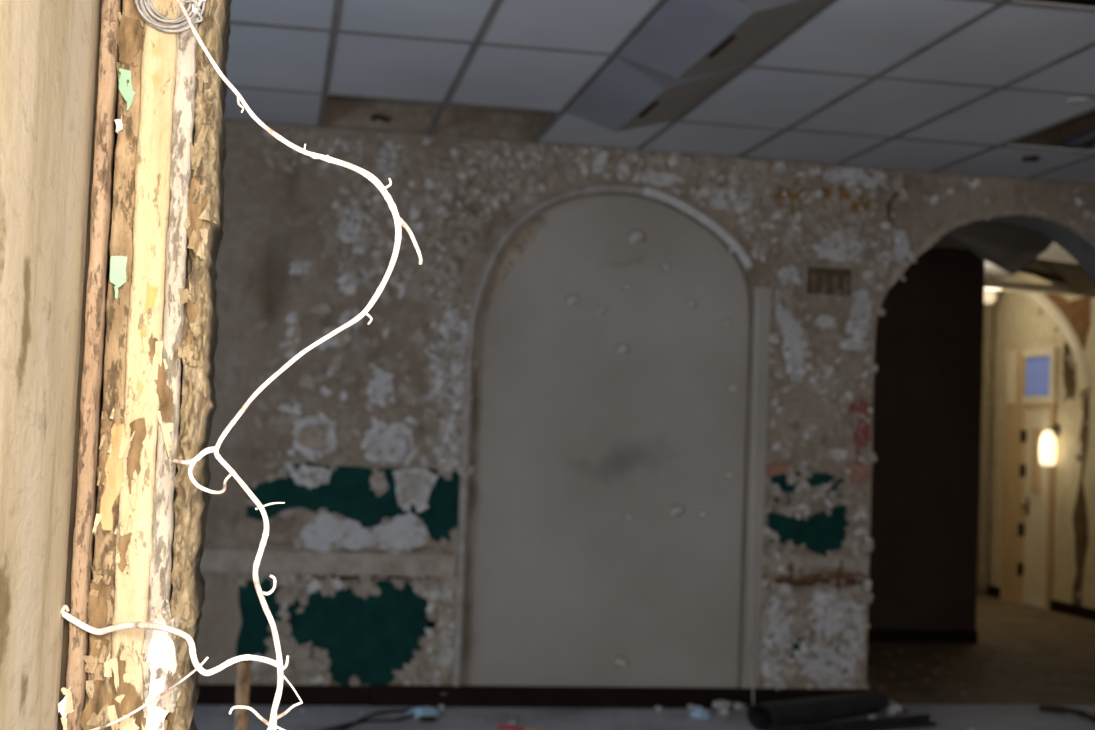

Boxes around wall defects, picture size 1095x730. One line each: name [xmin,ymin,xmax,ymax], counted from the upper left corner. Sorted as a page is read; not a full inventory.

peeling [115,12,145,133]
flaking render [58,61,217,730]
peeling [236,128,968,695]